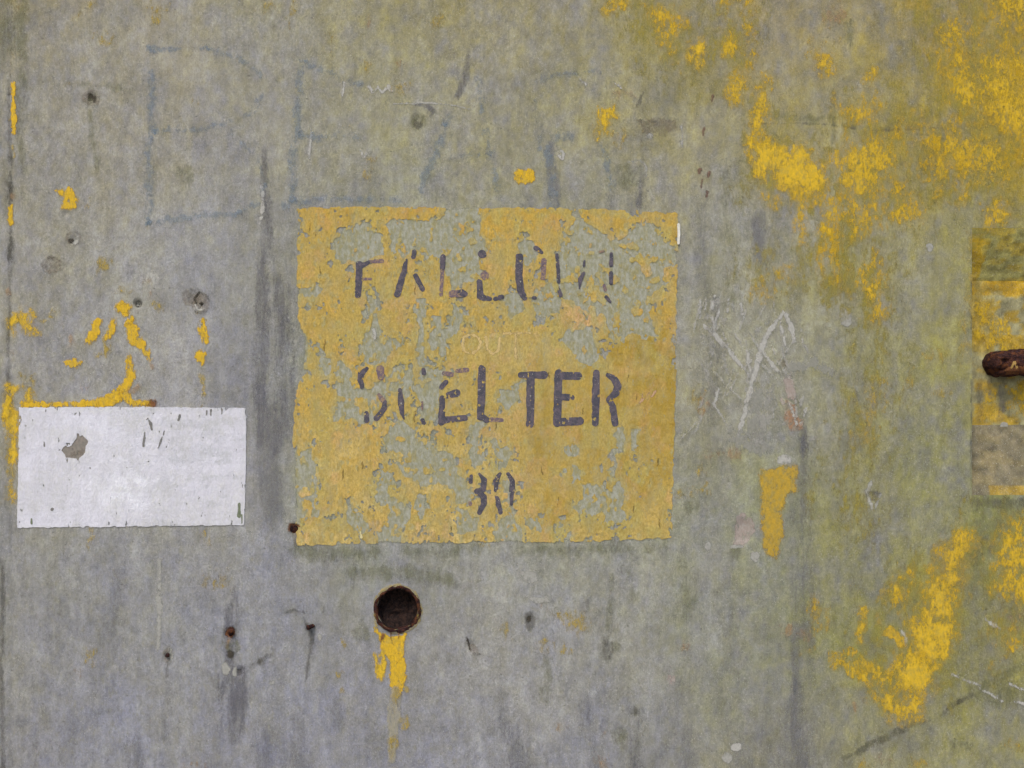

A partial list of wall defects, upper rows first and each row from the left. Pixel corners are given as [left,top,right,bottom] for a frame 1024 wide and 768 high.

peeling [744,0,1024,256]
peeling [7,308,39,336]
peeling [116,290,161,313]
peeling [318,208,572,543]
peeling [501,208,678,366]
corrosion [982,349,1024,378]
peeling [2,373,35,503]
peeling [61,433,88,460]
peeling [294,443,320,525]
peeling [559,426,641,525]
peeling [988,517,1024,604]
peeling [828,527,979,723]